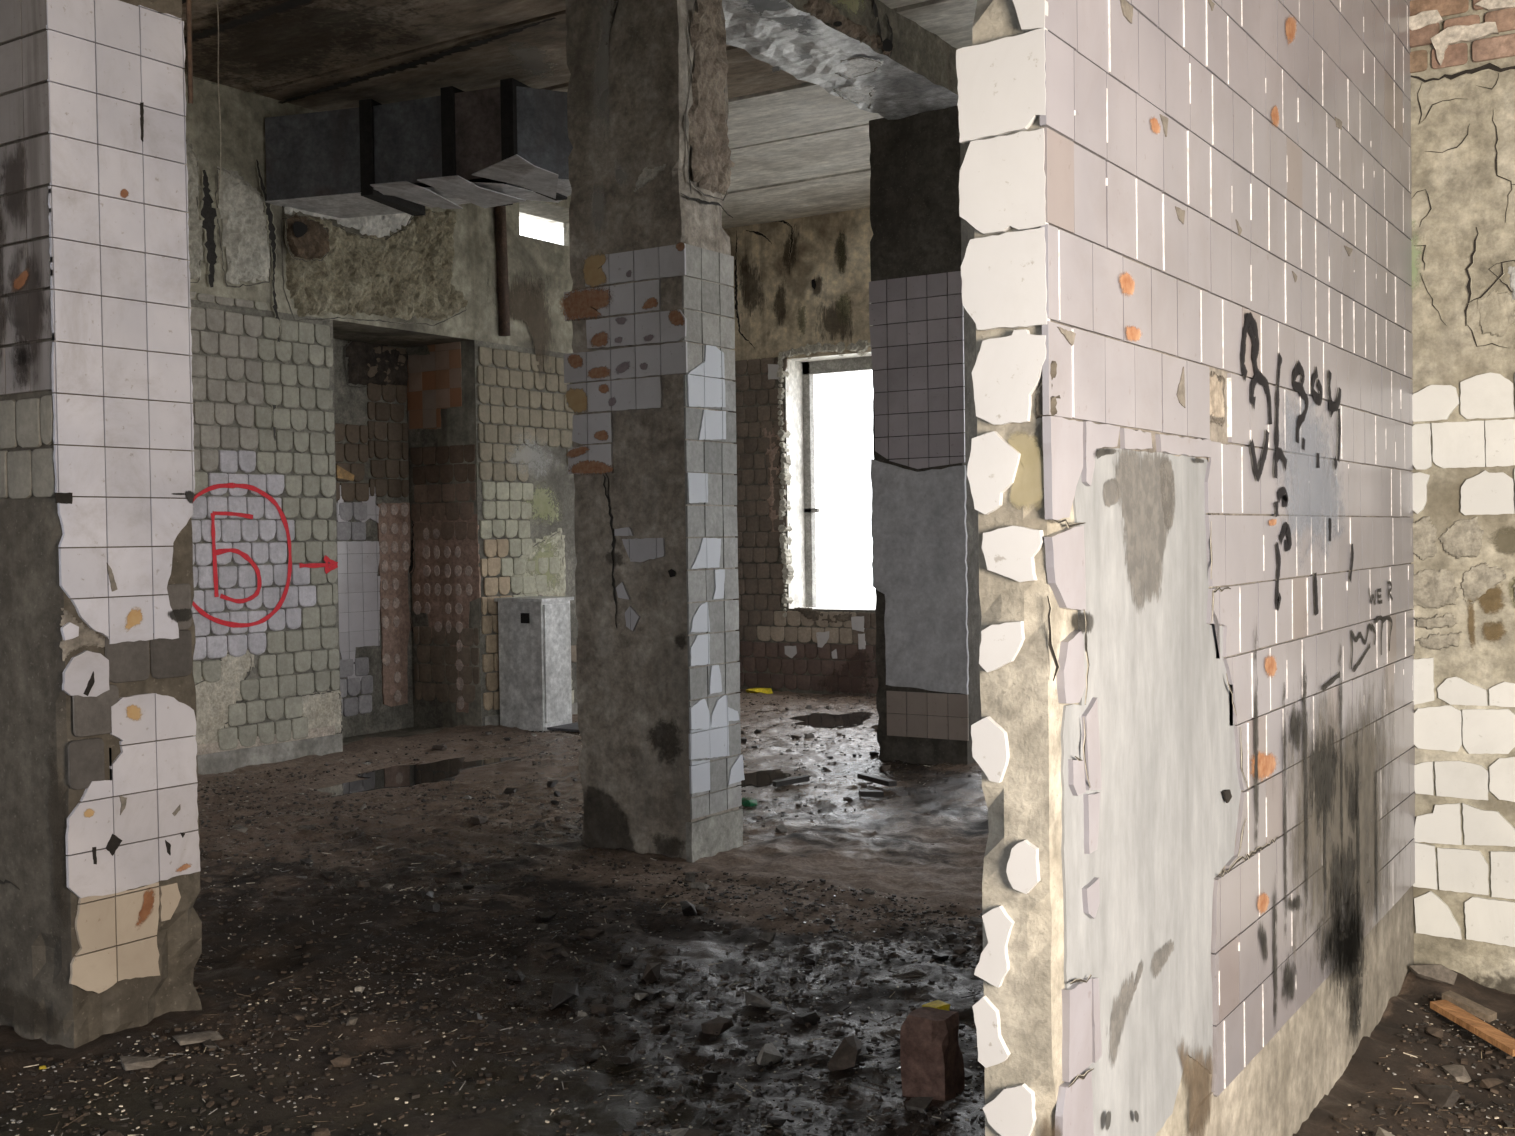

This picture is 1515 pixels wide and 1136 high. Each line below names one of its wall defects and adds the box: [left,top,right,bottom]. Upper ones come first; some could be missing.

crack [1411,61,1515,348]
leakage [0,140,48,387]
spalling [1057,327,1076,346]
spalling [1035,361,1061,419]
spalling [107,563,117,591]
crack [603,473,617,628]
peeling [59,608,105,661]
spalling [83,671,95,696]
spalling [92,834,123,864]
spalling [165,805,185,855]
leakage [1259,655,1378,1046]